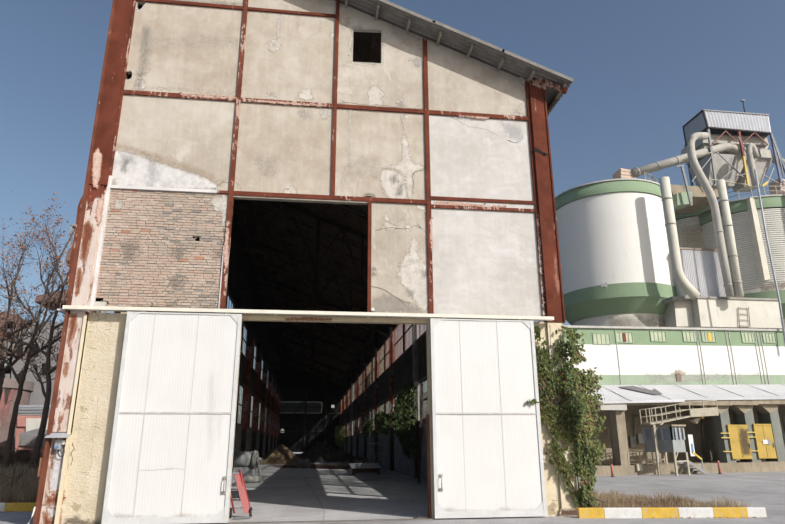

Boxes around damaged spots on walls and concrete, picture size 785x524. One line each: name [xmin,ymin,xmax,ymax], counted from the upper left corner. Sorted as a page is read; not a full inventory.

peeling [92,148,102,189]
peeling [380,107,433,251]
corrosion [74,221,94,296]
peeling [383,213,429,312]
corrosion [67,313,78,347]
corrosion [42,490,66,524]